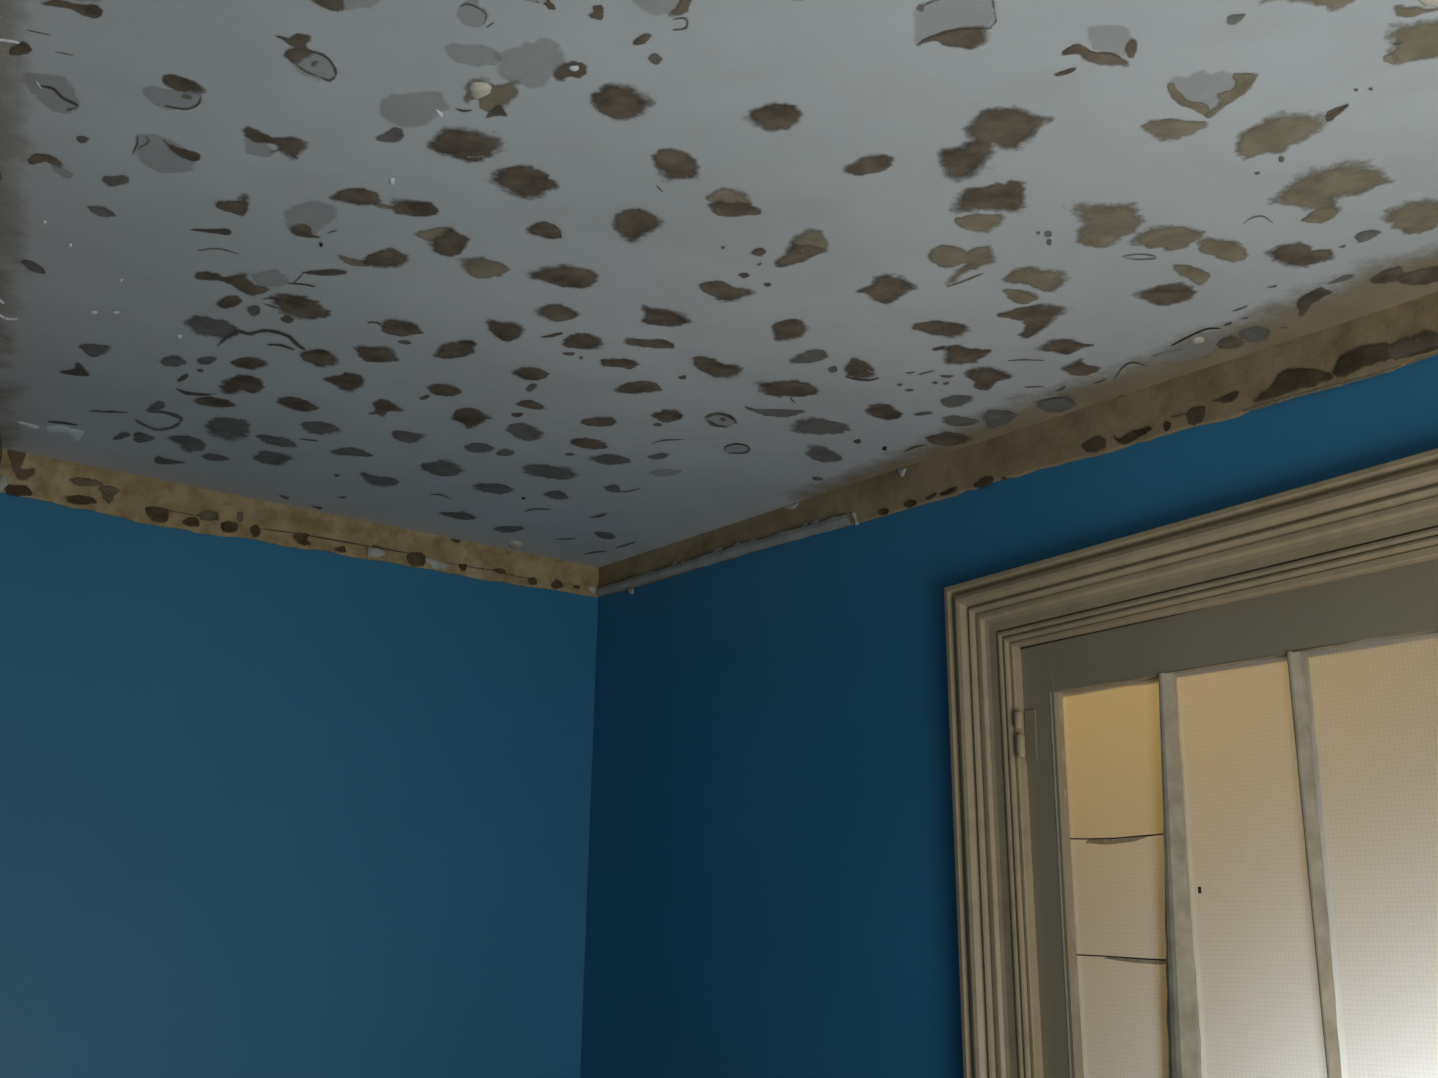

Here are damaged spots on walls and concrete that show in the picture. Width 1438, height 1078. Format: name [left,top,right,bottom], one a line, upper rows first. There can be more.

flaking render [429,80,559,198]
flaking render [591,85,650,120]
flaking render [750,104,801,131]
peeling [1142,73,1257,141]
flaking render [1237,88,1373,175]
flaking render [330,178,509,278]
flaking render [699,230,828,301]
flaking render [929,109,1052,287]
flaking render [1074,203,1247,306]
flaking render [1271,161,1391,224]
flaking render [1268,201,1438,268]
flaking render [0,248,1438,597]